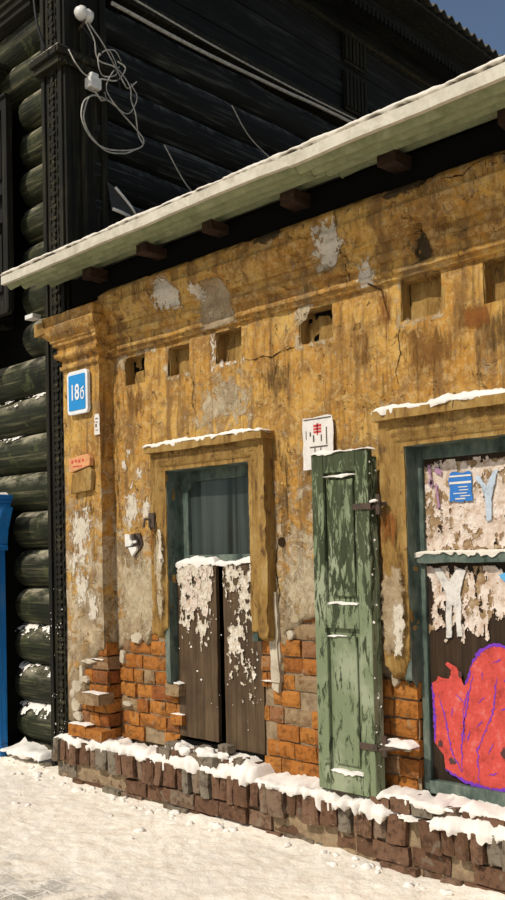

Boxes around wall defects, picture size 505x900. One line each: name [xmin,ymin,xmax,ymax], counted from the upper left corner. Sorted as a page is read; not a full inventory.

crack [435,153,505,190]
flaking render [311,215,343,272]
flaking render [356,257,375,289]
flaking render [150,276,252,434]
flaking render [68,449,188,745]
flaking render [176,527,319,778]
flaking render [381,565,405,657]